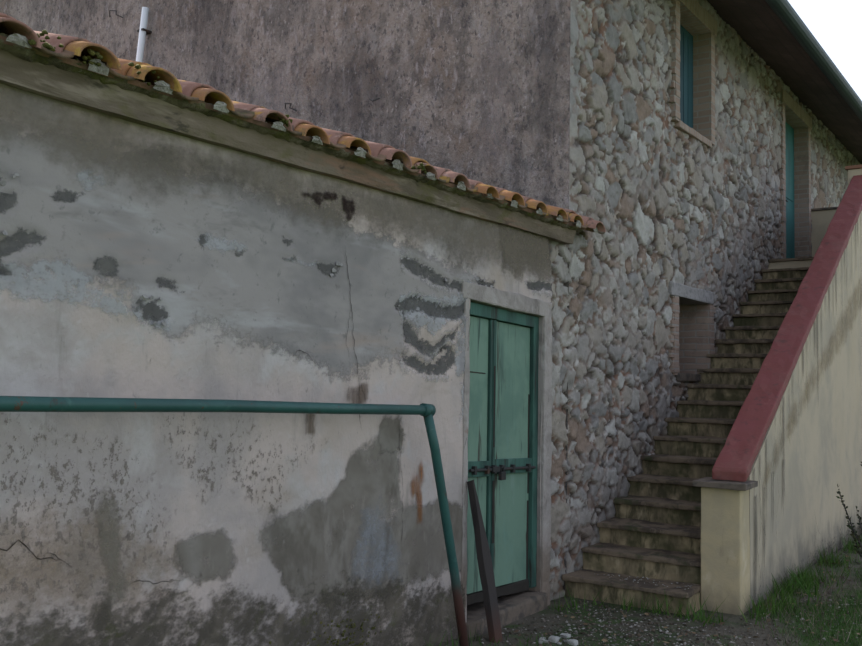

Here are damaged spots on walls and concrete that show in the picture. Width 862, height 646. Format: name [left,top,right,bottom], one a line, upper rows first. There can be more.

peeling [0,124,495,382]
crack [345,253,366,418]
flaking render [525,281,553,296]
crack [0,529,72,567]
damp [0,416,465,646]
rust [412,465,423,520]